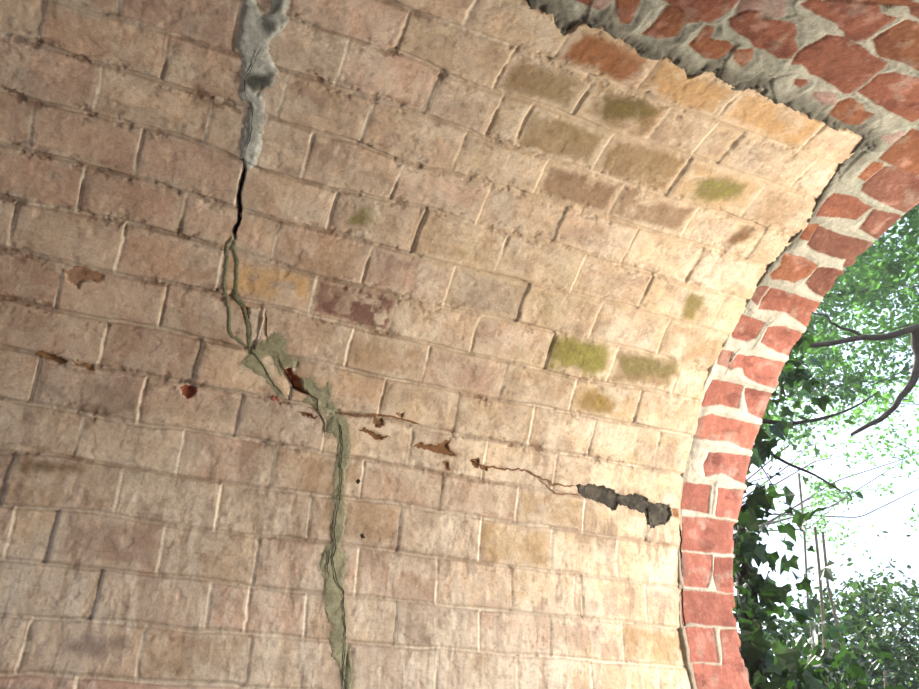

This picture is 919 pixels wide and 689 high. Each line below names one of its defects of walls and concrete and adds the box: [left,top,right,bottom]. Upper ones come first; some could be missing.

water stain [265,0,283,34]
water stain [249,76,273,91]
crack [222,48,422,689]
peeling [359,416,390,440]
crack [469,460,581,496]
peeling [576,484,673,529]